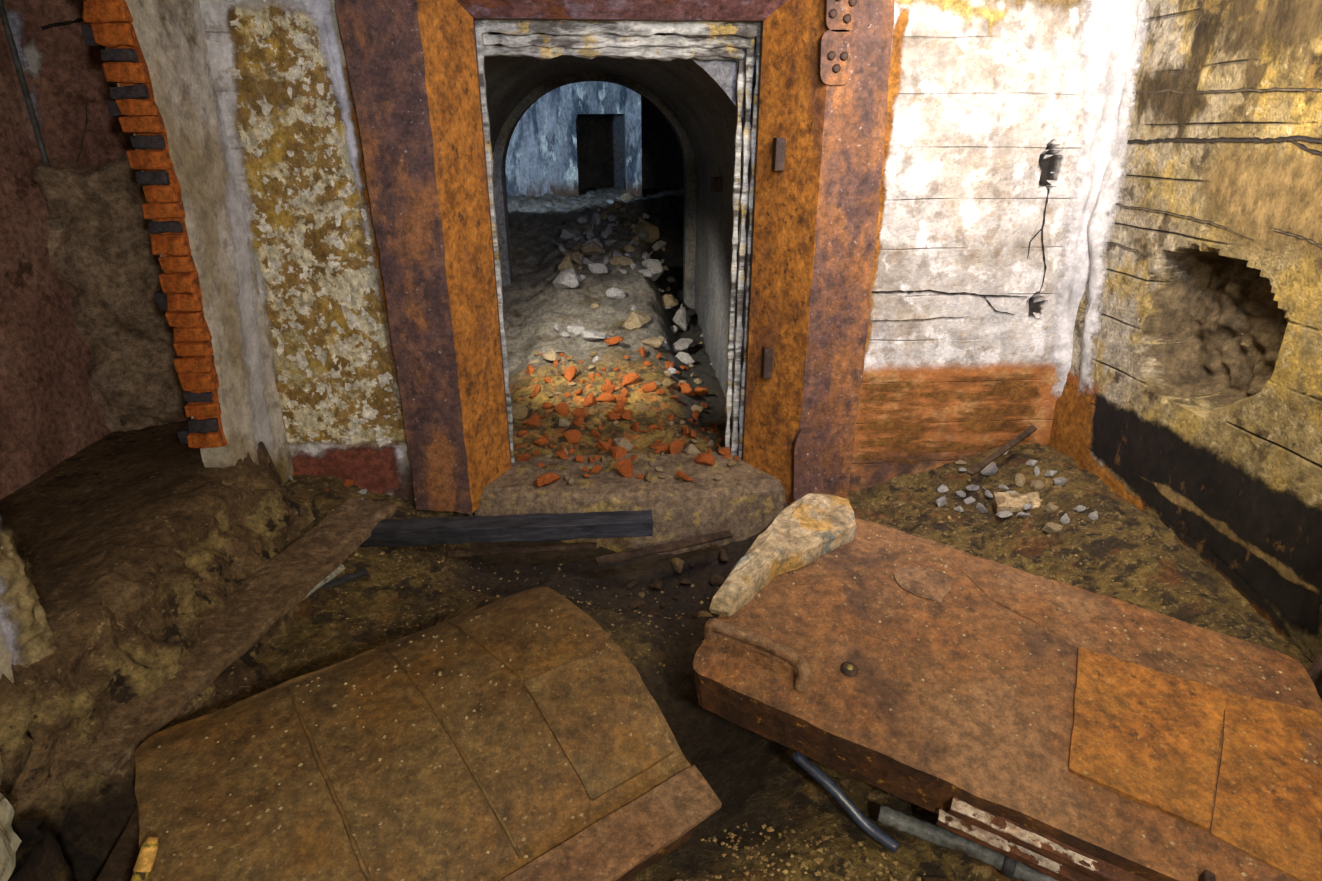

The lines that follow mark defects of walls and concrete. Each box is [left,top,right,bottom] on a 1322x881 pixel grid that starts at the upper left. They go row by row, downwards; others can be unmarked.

water stain [217,93,273,449]
water stain [296,0,364,187]
rust [343,66,399,385]
crack [1104,242,1146,255]
crack [1115,203,1322,248]
crack [1127,135,1322,155]
crack [1131,86,1322,94]
water stain [1136,0,1322,148]
water stain [1200,136,1322,257]
water stain [1297,351,1322,430]
water stain [1161,517,1290,636]